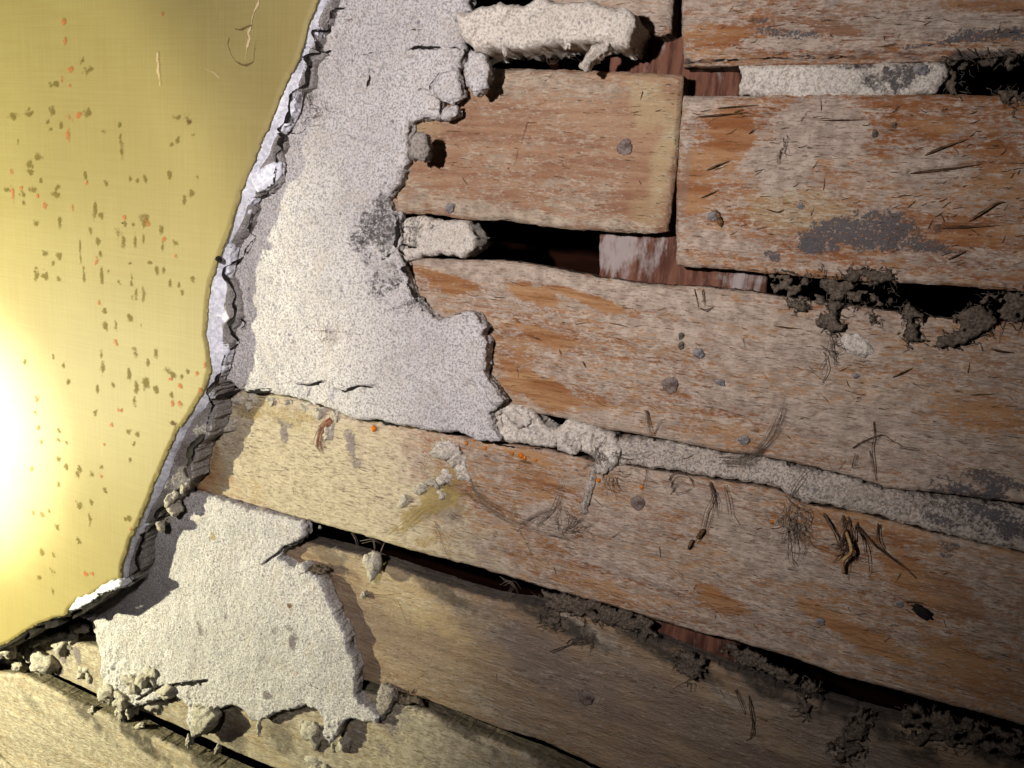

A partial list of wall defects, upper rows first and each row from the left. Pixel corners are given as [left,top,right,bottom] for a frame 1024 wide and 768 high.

peeling [432,50,495,122]
peeling [377,210,412,309]
spalling [0,0,341,650]
crack [25,0,382,640]
peeling [839,333,875,358]
peeling [479,369,507,407]
peeling [911,603,934,621]
peeling [190,704,222,738]
peeling [376,682,399,721]